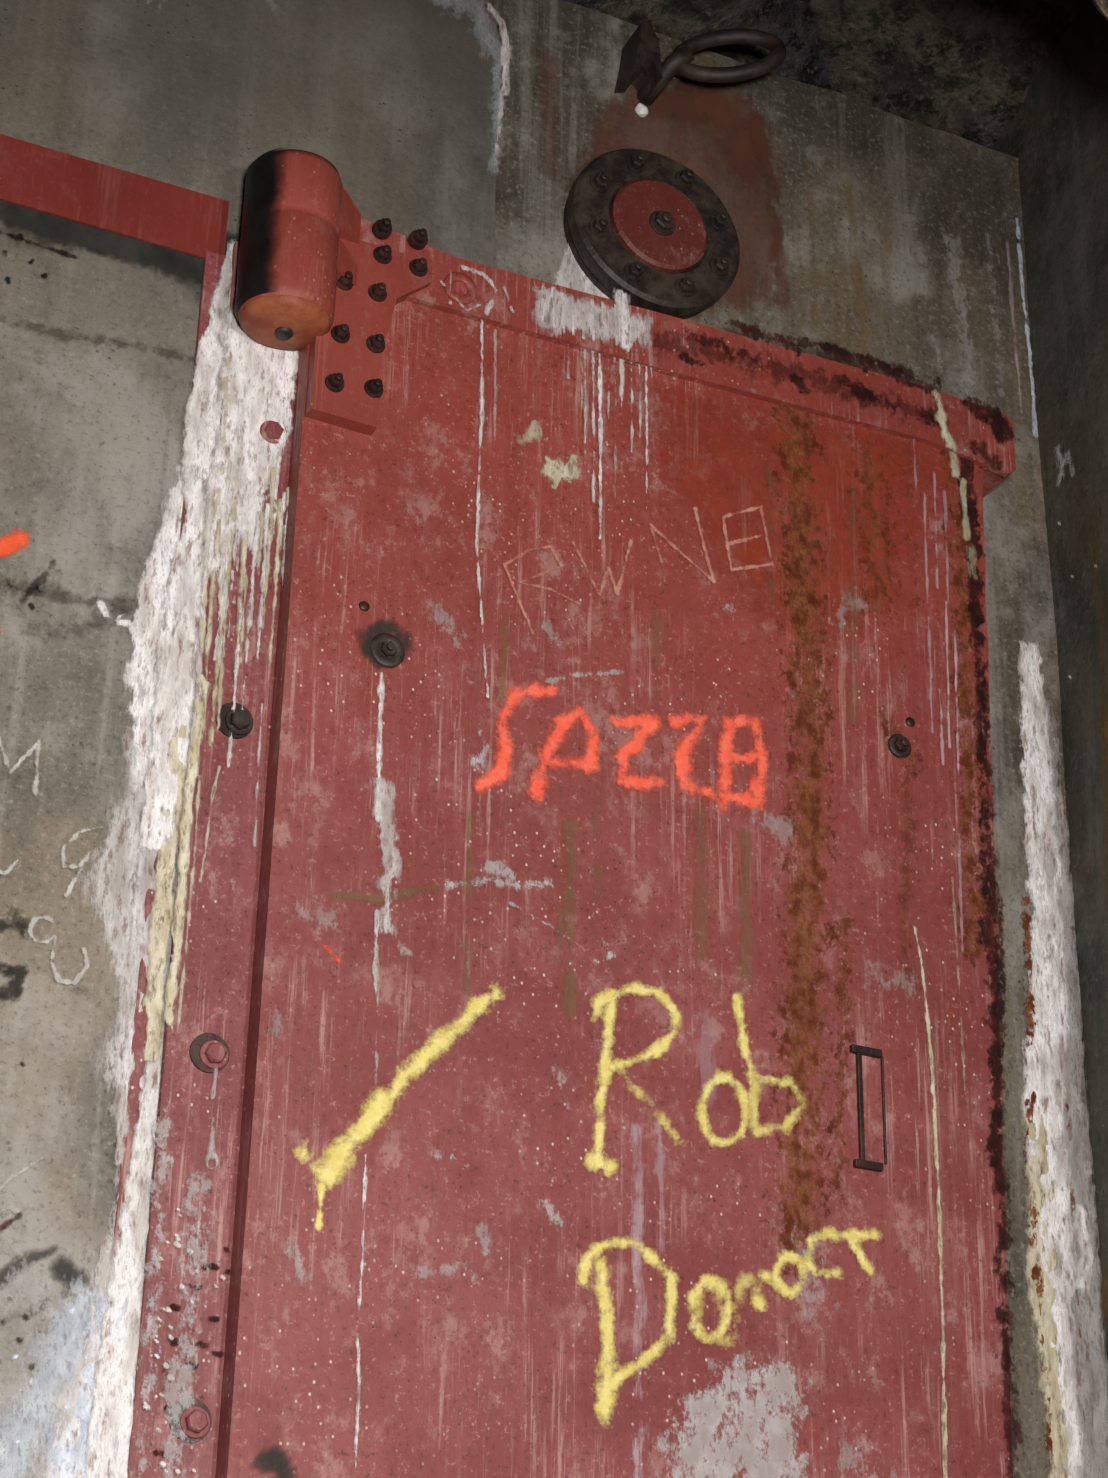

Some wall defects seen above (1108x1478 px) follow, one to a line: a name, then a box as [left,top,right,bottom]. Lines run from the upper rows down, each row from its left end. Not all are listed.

water stain [0,200,299,1478]
peeling [678,352,705,366]
corrosion [763,405,854,1281]
peeling [724,320,941,425]
corrosion [940,450,990,966]
peeling [958,392,1025,1478]
water stain [1018,641,1093,1478]